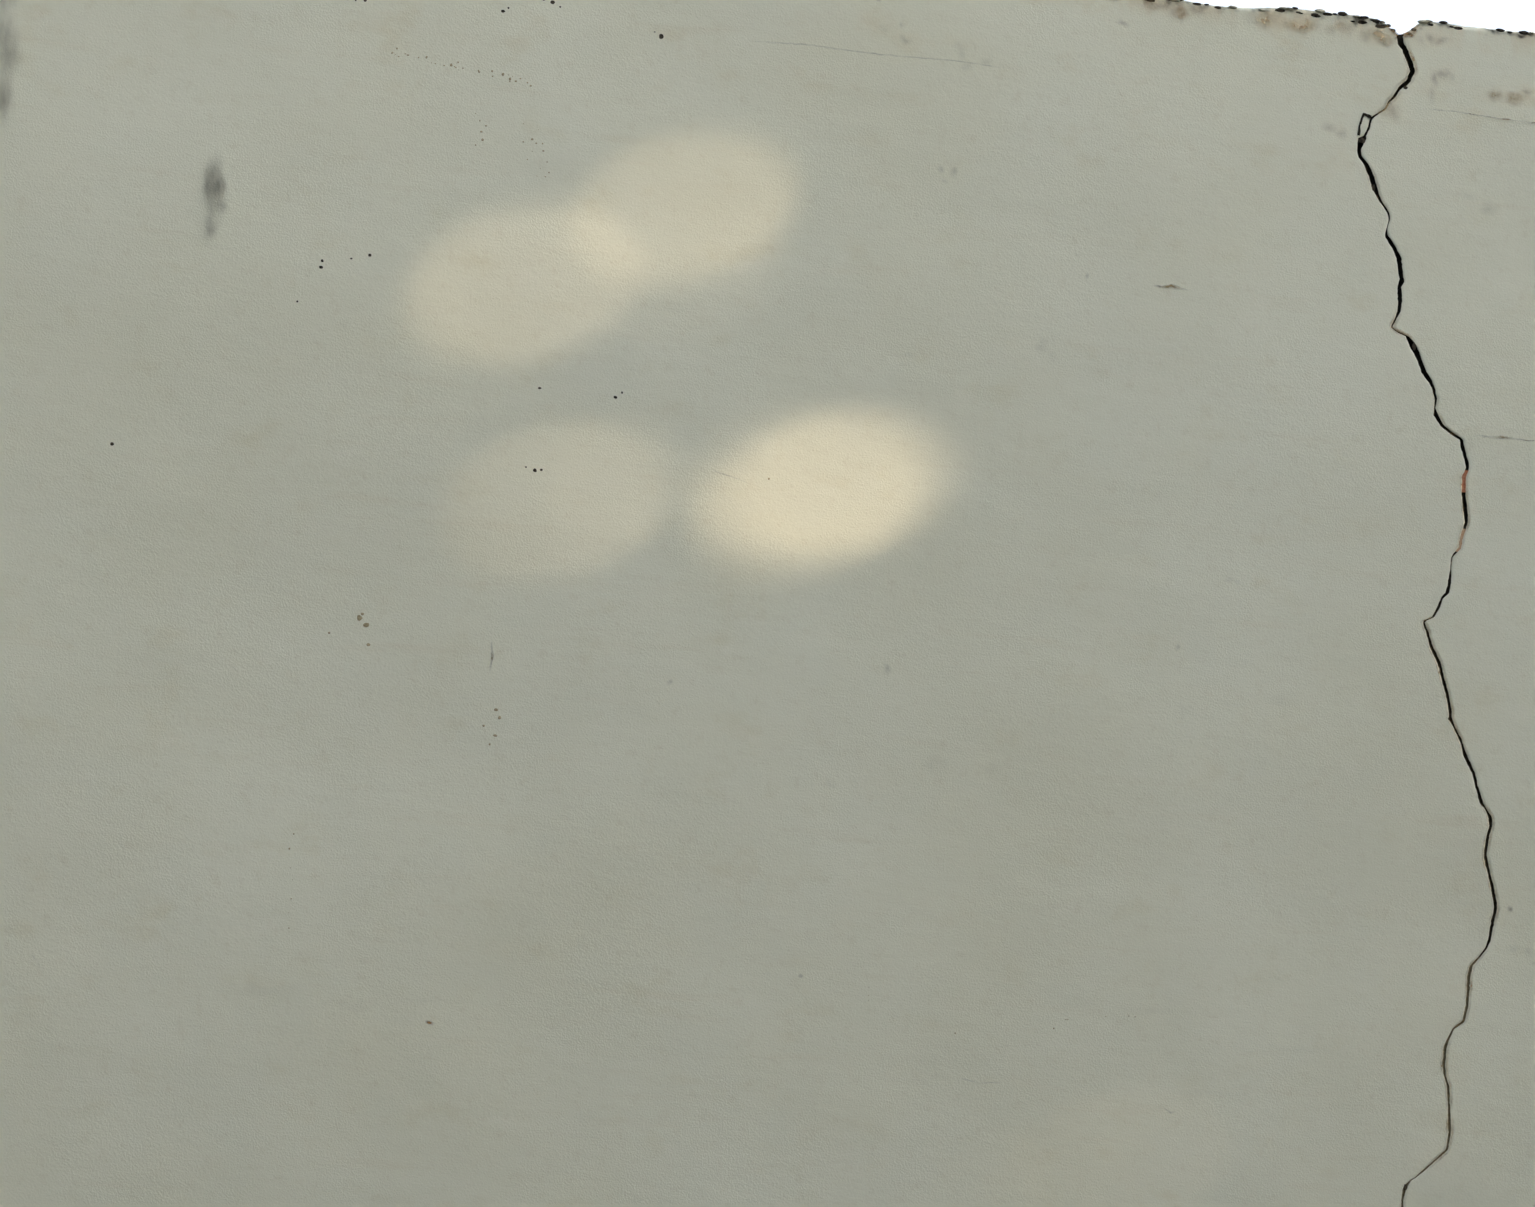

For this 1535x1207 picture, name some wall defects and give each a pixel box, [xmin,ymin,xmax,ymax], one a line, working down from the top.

crack [1357,34,1497,1207]